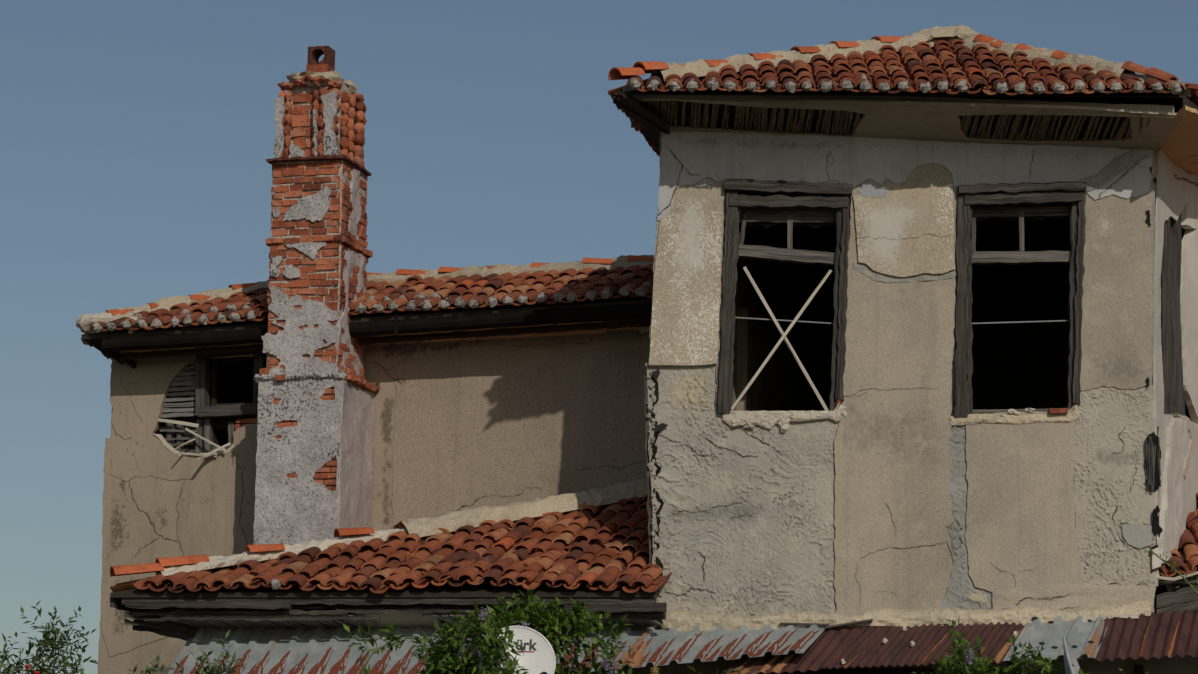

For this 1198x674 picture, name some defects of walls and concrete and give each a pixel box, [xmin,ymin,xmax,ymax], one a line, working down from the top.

flaking render [273,91,340,158]
flaking render [262,169,367,378]
flaking render [853,184,955,283]
crack [108,387,189,557]
spalling [153,361,258,459]
flaking render [644,209,722,599]
crack [666,552,714,596]
crack [672,501,753,519]
crack [658,432,783,457]
crack [855,503,954,600]
rust [977,630,1021,663]
rust [1083,621,1103,657]